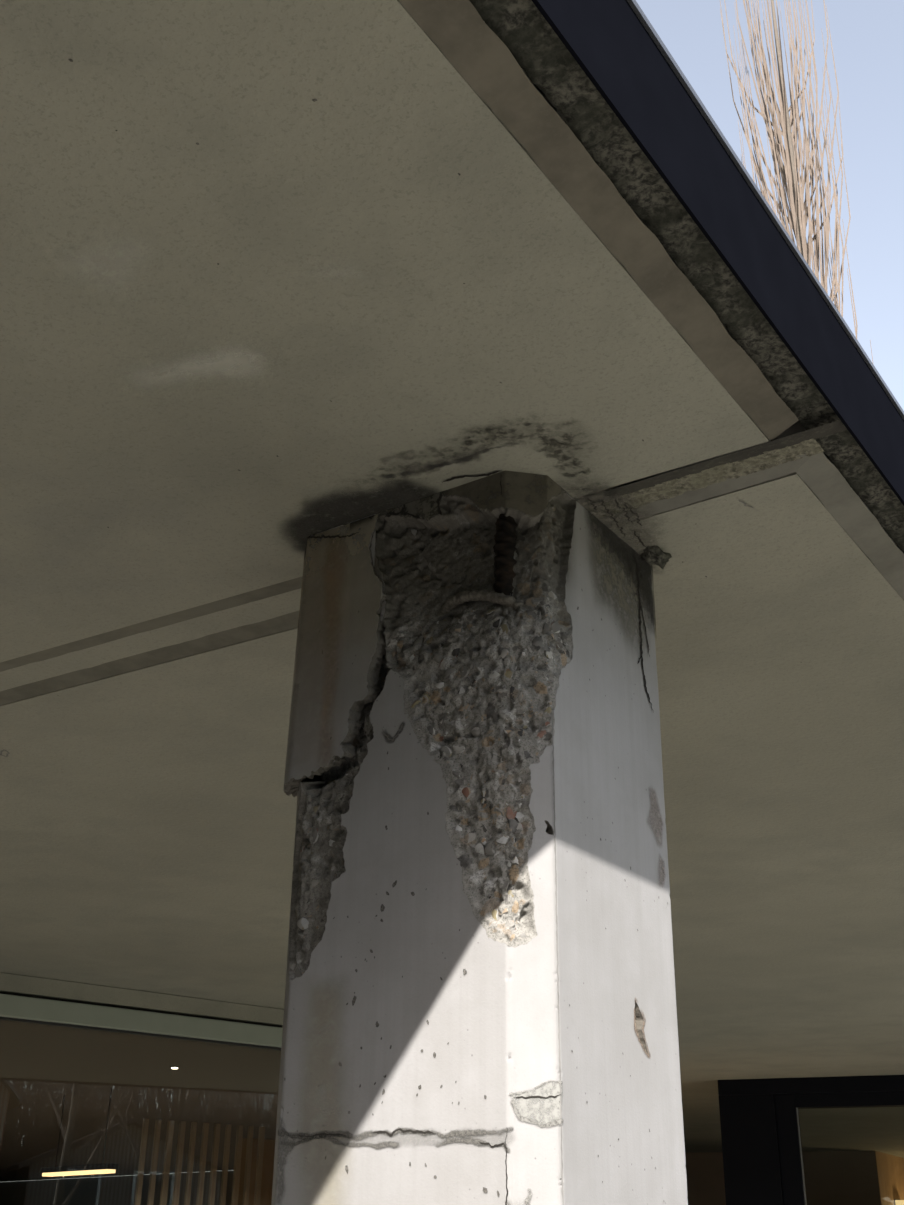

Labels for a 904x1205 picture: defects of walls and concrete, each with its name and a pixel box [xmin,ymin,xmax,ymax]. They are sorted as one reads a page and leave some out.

water stain [289,423,585,558]
water stain [567,486,653,557]
crack [631,547,654,712]
crack [382,723,405,743]
spalling [289,492,581,981]
crack [551,713,564,1205]
crack [278,1127,532,1205]
peeling [509,1081,563,1128]